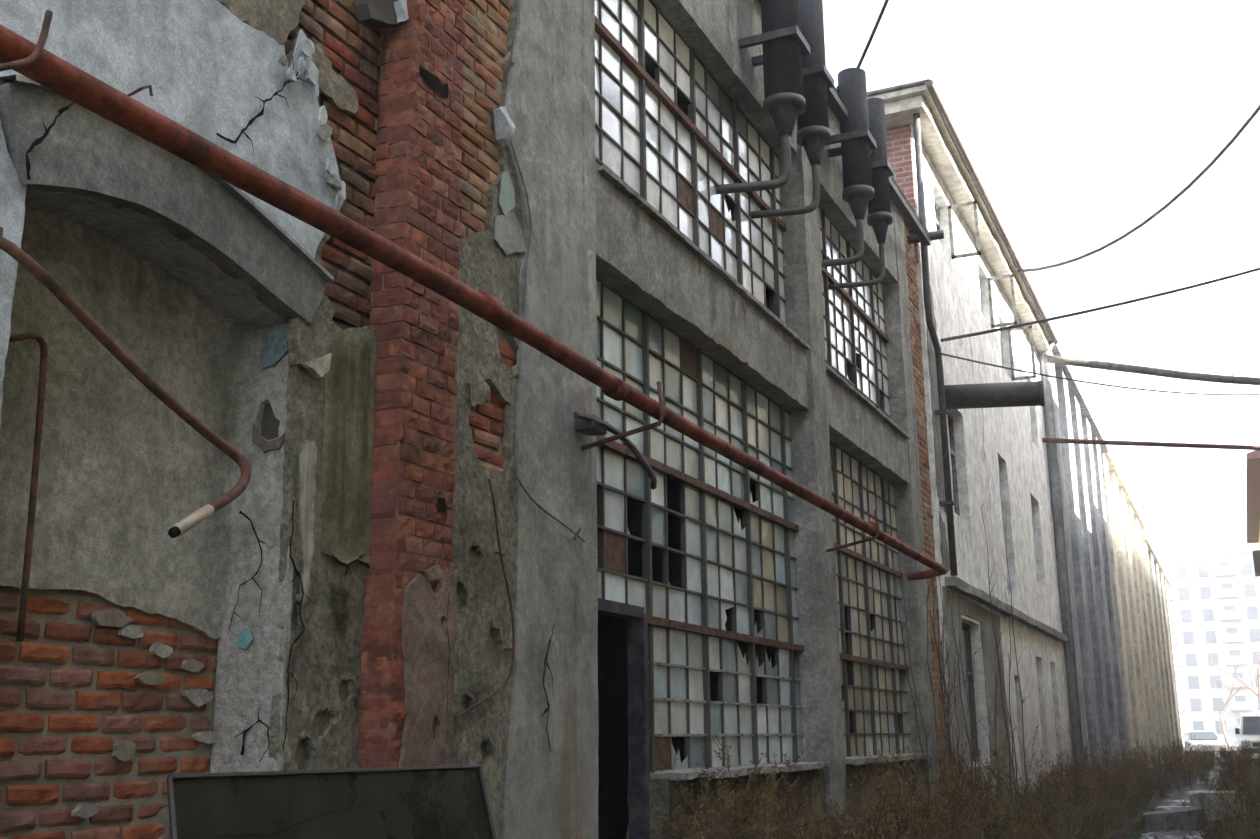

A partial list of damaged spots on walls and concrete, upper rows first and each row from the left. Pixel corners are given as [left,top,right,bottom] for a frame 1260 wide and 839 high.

crack [26,102,74,180]
crack [216,56,312,153]
spalling [217,0,409,231]
spalling [260,236,373,378]
spalling [496,327,520,379]
spalling [252,403,286,452]
spalling [467,380,505,474]
crack [332,550,370,577]
spalling [0,586,219,839]
crack [227,501,314,762]
flaking render [398,565,476,767]